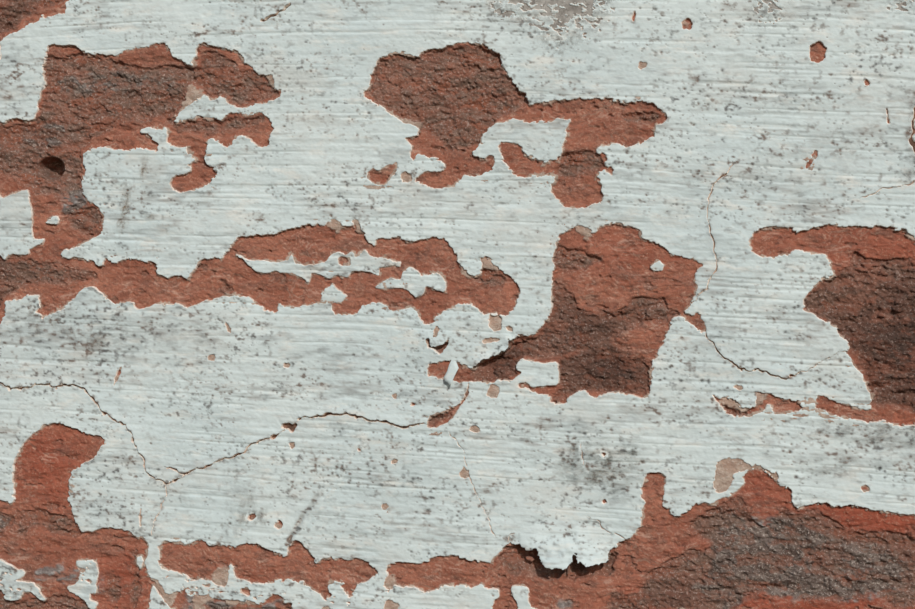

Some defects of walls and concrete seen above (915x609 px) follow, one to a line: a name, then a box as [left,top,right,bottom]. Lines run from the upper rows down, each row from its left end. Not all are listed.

peeling [0,0,69,41]
peeling [491,0,615,48]
peeling [754,0,782,24]
crack [907,107,915,152]
peeling [801,148,821,171]
peeling [0,42,706,436]
peeling [713,223,915,427]
crack [166,412,420,484]
peeling [0,423,915,609]